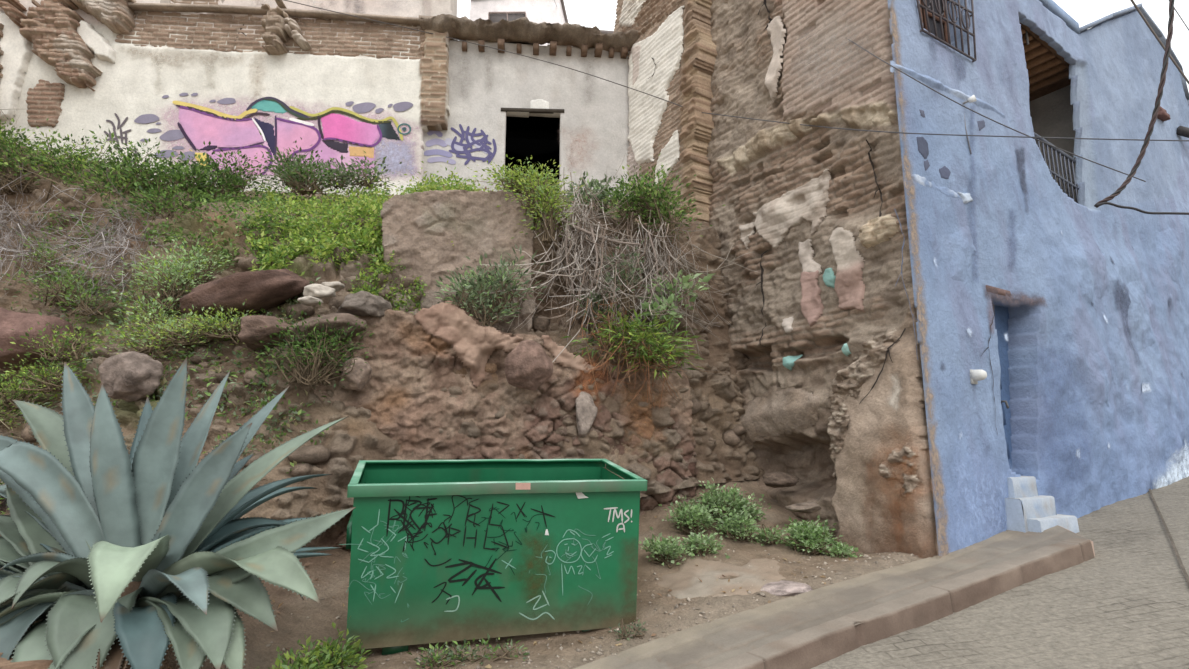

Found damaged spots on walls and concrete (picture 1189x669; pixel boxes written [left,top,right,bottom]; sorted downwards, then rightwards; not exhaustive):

spalling [0,0,269,128]
spalling [284,17,426,60]
peeling [621,0,684,191]
crack [859,140,923,404]